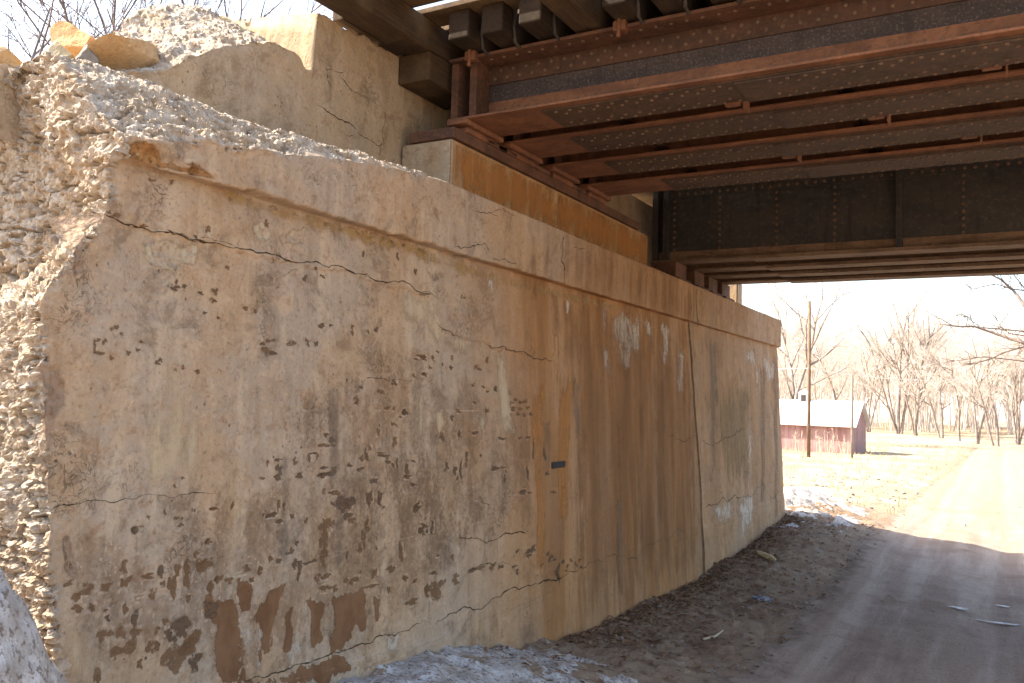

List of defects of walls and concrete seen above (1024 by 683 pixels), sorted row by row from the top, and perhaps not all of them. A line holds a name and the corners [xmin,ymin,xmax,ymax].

crack [318,68,386,153]
rust [456,147,647,265]
crack [85,213,437,298]
spalling [0,2,582,675]
damp [603,311,684,392]
crack [54,492,213,508]
crack [247,306,775,681]
damp [715,496,755,536]